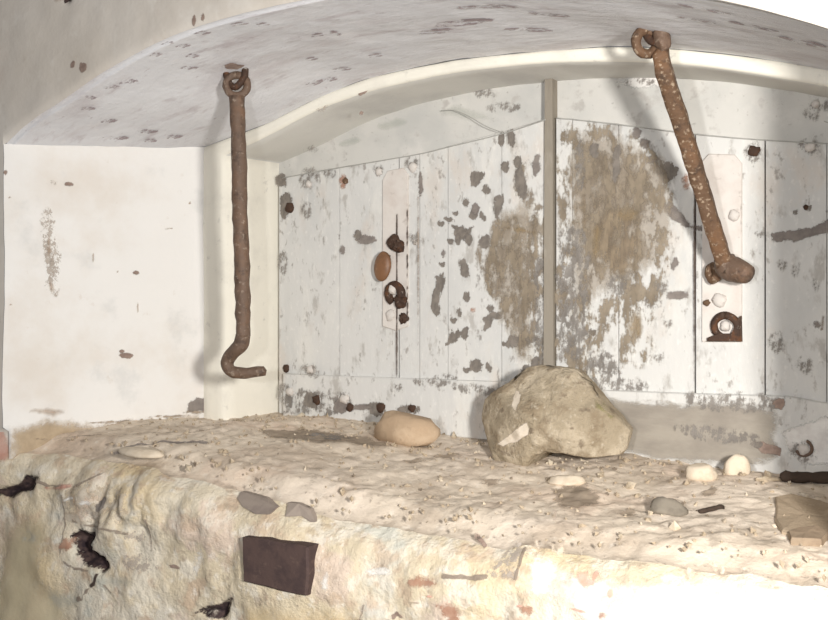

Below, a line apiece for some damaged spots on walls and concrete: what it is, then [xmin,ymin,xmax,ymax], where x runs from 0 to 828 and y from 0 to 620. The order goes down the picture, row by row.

peeling [431,129,544,372]
damp [554,123,673,377]
peeling [278,384,386,417]
peeling [413,358,498,396]
spalling [0,474,151,602]
hole [195,597,233,620]